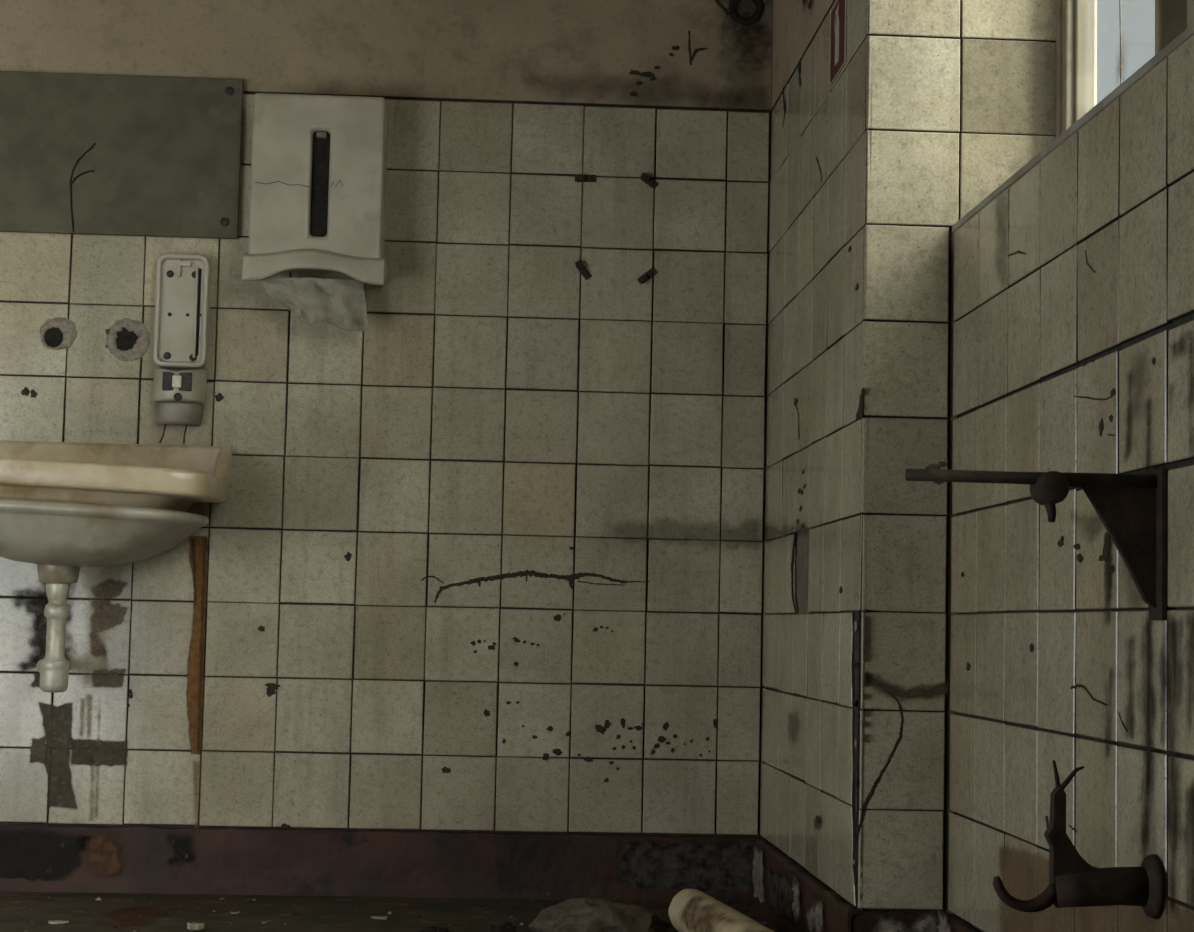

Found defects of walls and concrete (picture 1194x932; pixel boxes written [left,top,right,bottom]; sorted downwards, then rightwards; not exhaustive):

peeling [0,830,89,881]
rust [186,536,207,792]
crack [421,570,650,603]
spalling [791,470,812,614]
spalling [852,609,865,840]
leakage [1000,616,1194,932]